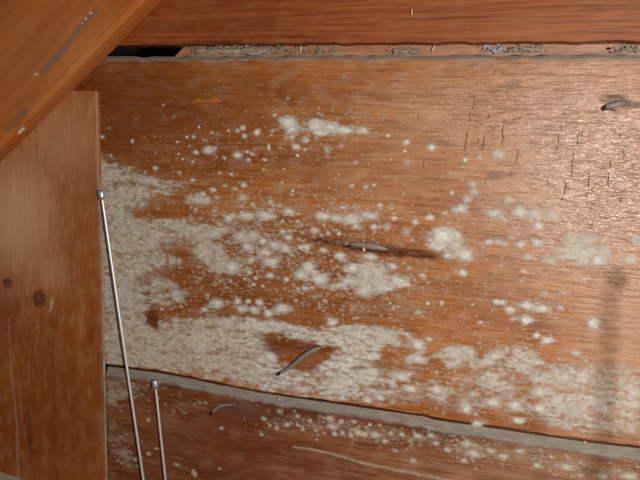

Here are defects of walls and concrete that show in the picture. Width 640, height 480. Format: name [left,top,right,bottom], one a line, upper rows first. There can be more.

water stain [175,136,226,166]
water stain [270,106,377,157]
crack [464,97,529,162]
water stain [101,154,640,442]
water stain [262,411,524,462]
water stain [534,456,589,479]
water stain [595,460,639,480]